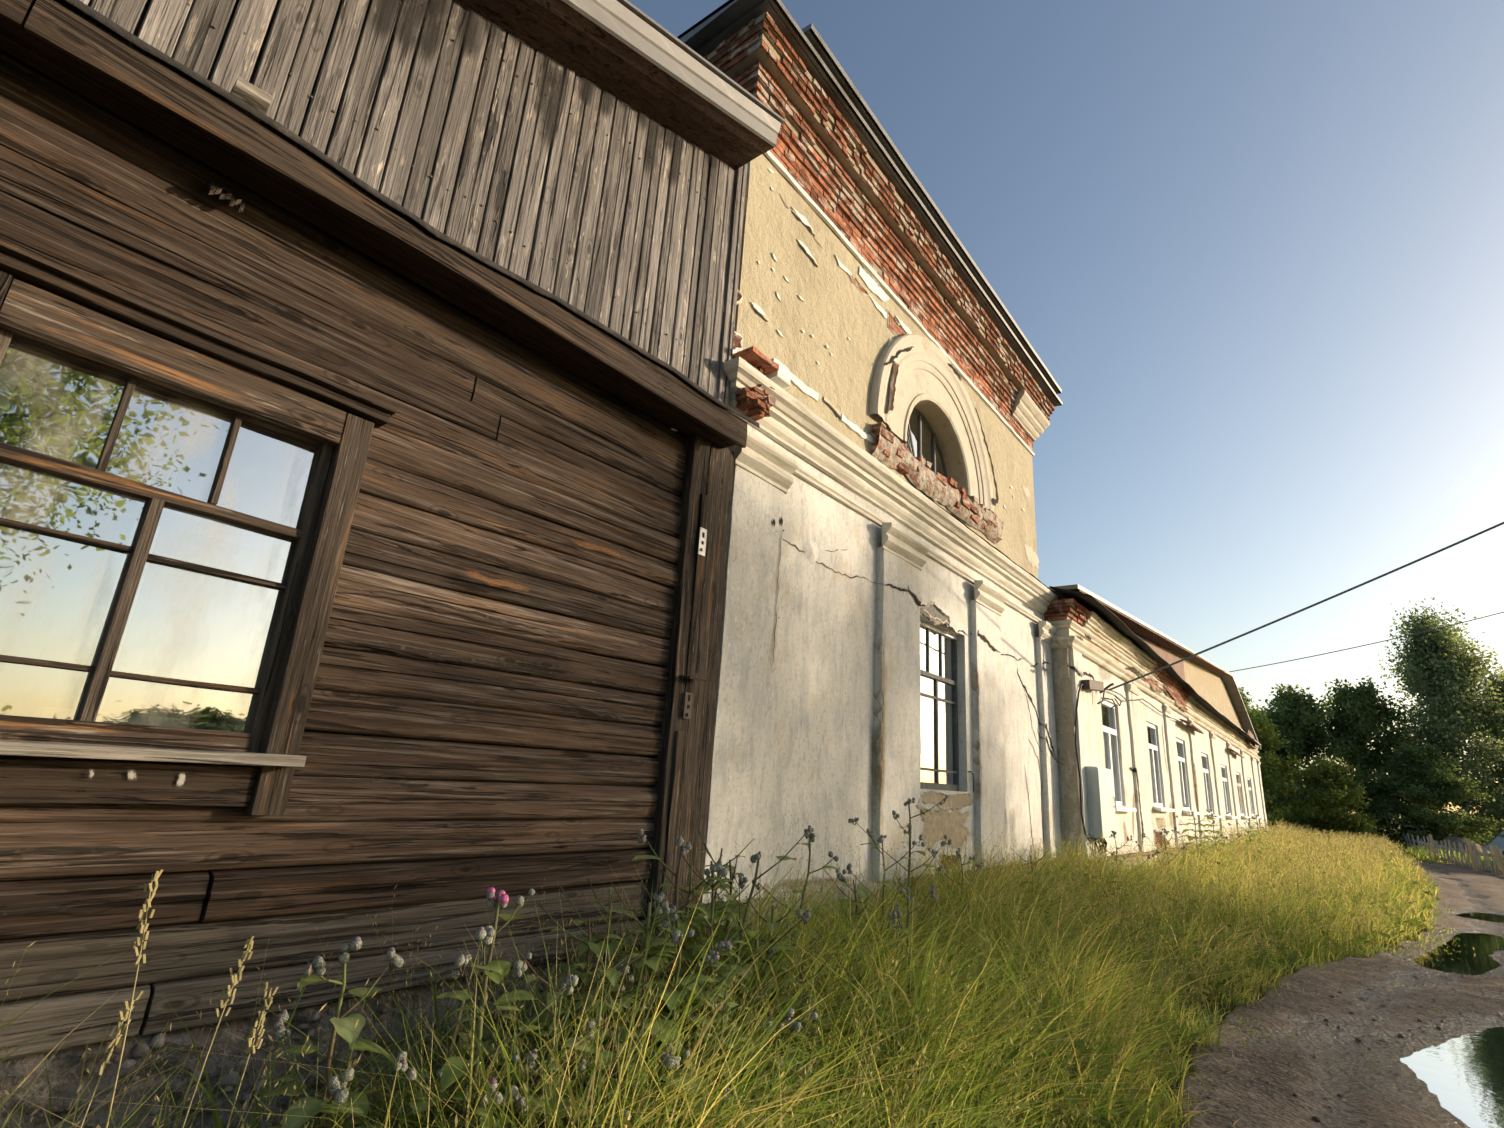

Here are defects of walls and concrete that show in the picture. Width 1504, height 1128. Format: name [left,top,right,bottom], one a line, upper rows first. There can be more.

peeling [736,290,784,338]
peeling [757,252,804,302]
peeling [790,207,819,267]
peeling [834,255,912,413]
spalling [732,331,819,423]
peeling [840,414,877,445]
crack [771,530,1168,854]
peeling [916,790,974,871]